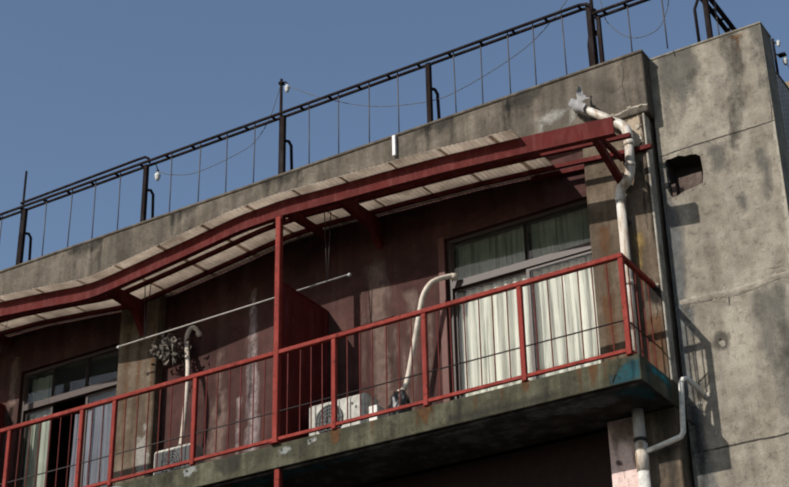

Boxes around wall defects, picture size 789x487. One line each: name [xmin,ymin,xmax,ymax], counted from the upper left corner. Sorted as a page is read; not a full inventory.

hole [665,168,705,199]
leakage [363,262,418,416]
spalling [715,334,728,347]
leakage [219,294,259,473]
crack [692,432,789,453]